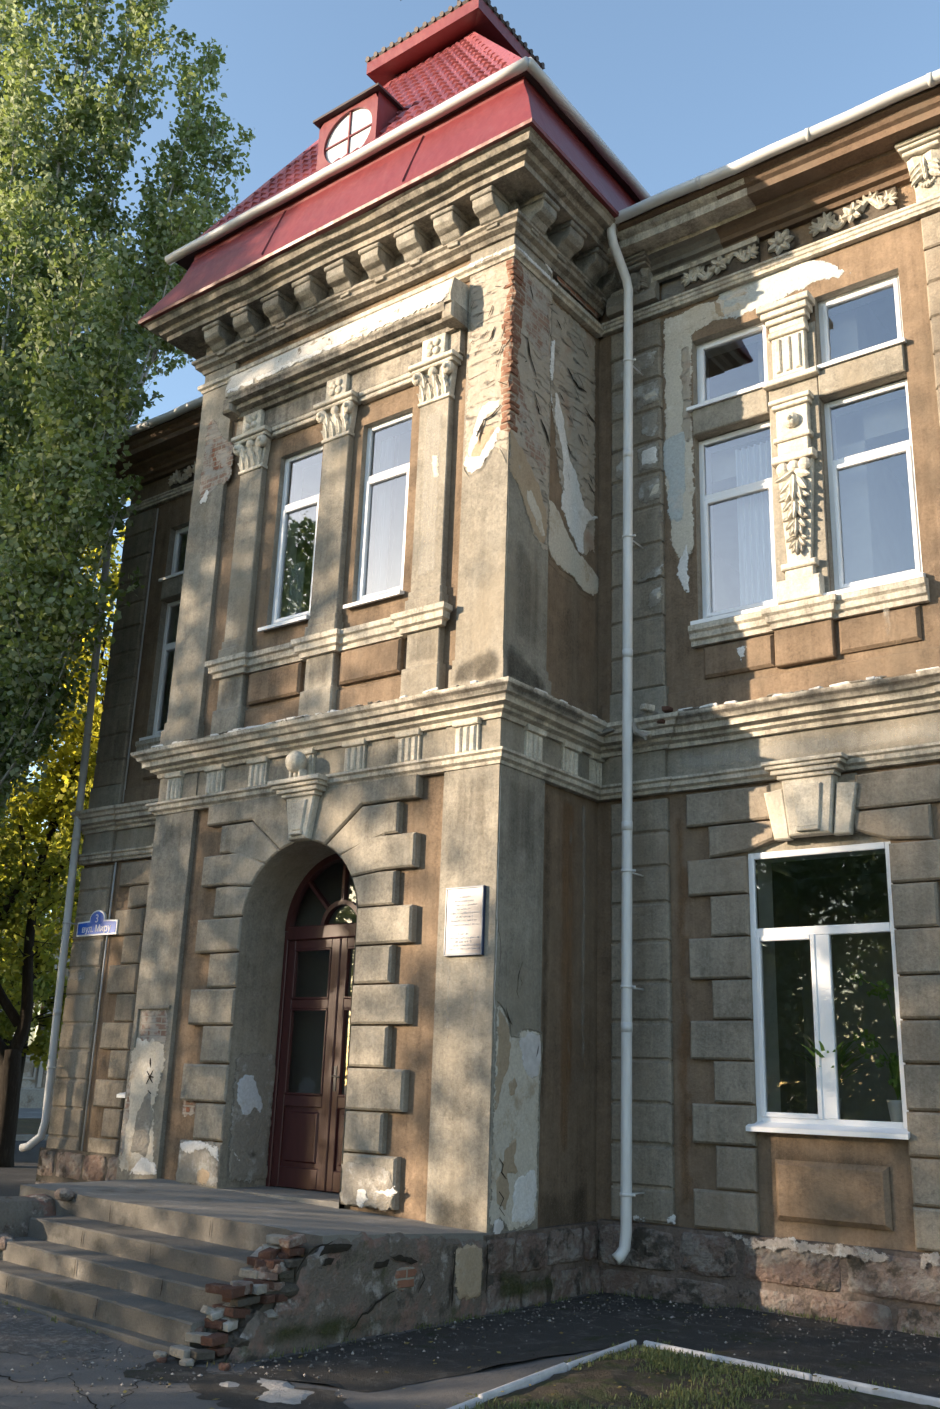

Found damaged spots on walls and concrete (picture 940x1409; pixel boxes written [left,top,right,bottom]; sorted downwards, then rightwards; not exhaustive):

peeling [226,278,453,393]
flaking render [199,418,234,504]
spalling [462,245,851,609]
flaking render [118,1005,171,1176]
flaking render [175,1053,276,1187]
flaking render [339,1162,397,1211]
flaking render [487,1000,543,1234]
spalling [169,1234,352,1363]